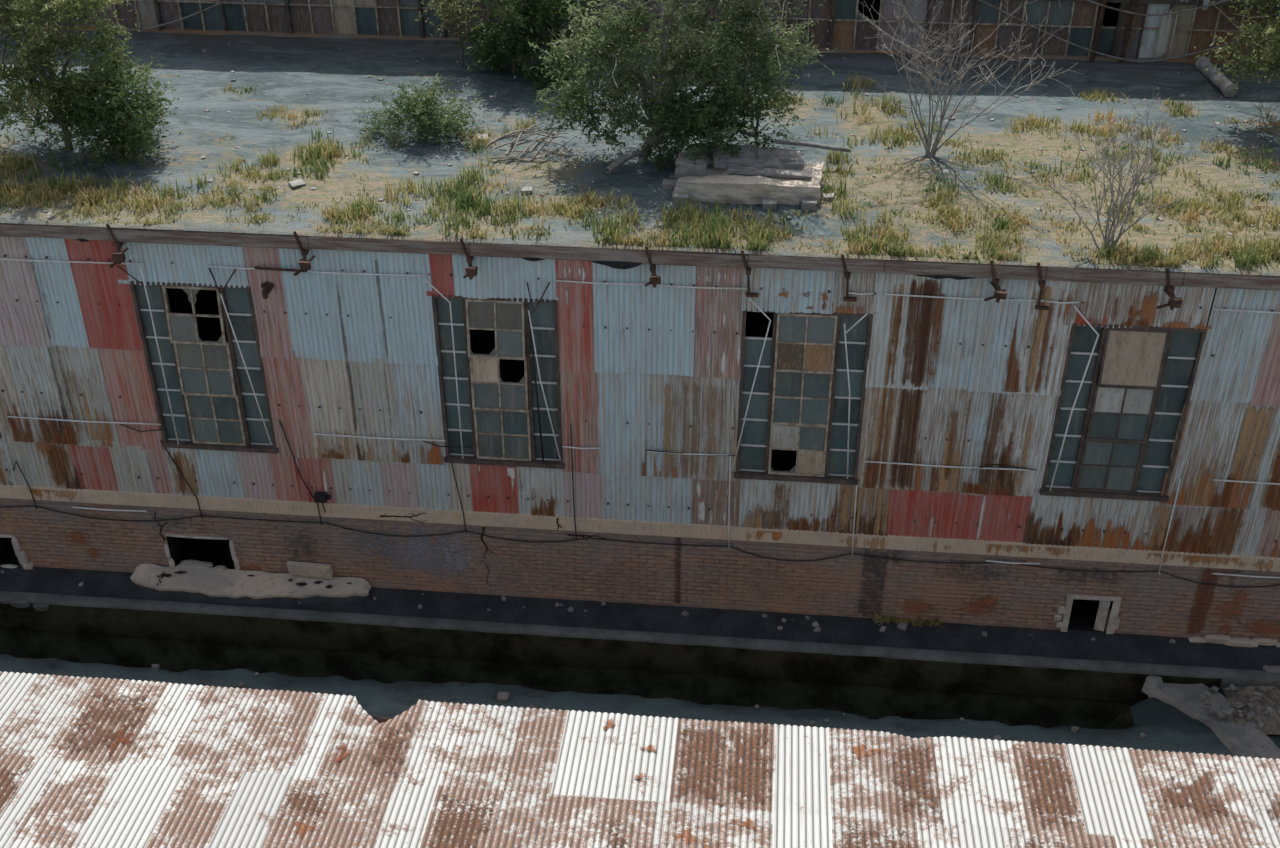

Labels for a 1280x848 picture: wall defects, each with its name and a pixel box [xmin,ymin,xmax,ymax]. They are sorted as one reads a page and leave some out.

rust [0,370,114,501]
rust [747,279,1119,550]
crack [481,527,496,582]
rust [986,403,1280,634]
rust [58,685,155,760]
rust [0,767,32,812]
rust [278,785,329,837]
rust [426,794,500,848]
rust [669,724,776,830]
rust [841,736,944,848]
rust [1014,747,1088,848]
rust [1149,763,1243,833]